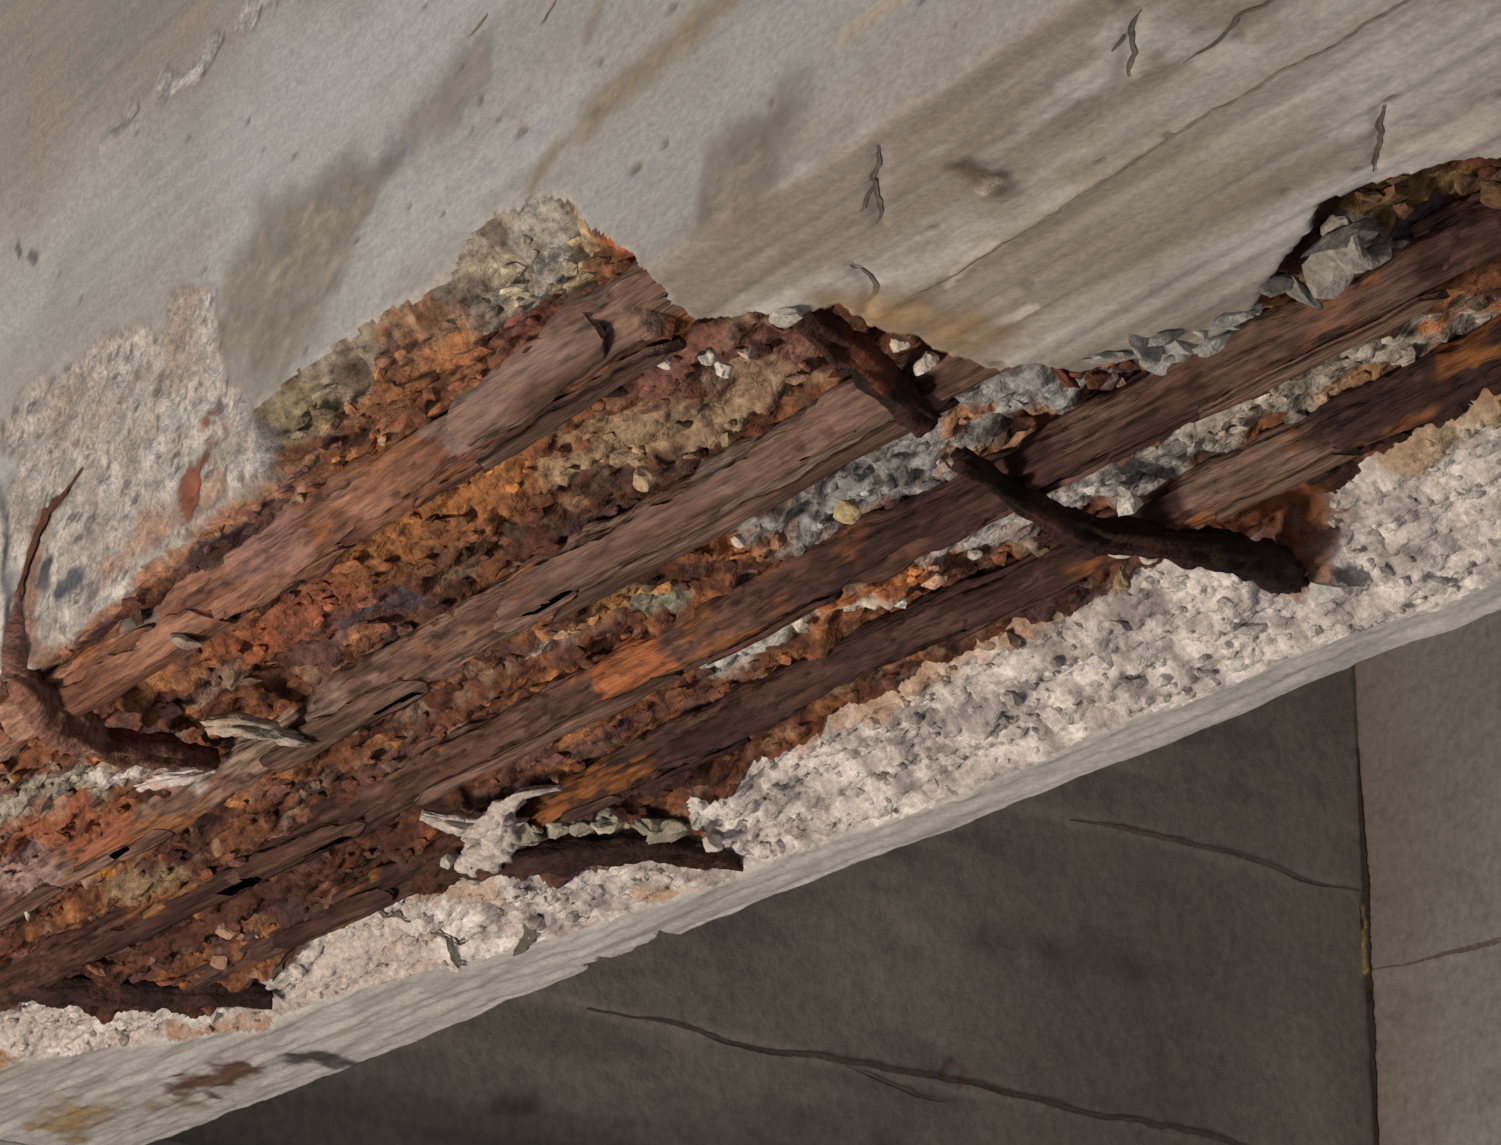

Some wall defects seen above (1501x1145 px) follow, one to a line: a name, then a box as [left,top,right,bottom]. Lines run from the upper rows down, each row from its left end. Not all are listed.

peeling [109,0,274,137]
crack [849,0,1412,307]
water stain [221,170,382,370]
rust [817,296,1001,349]
rust [177,412,226,522]
rust [1234,483,1332,584]
spalling [0,156,1501,1071]
crack [513,914,535,957]
crack [1070,748,1501,1145]
rust [26,1106,109,1143]
rust [152,1062,259,1110]
crack [587,1008,1246,1145]